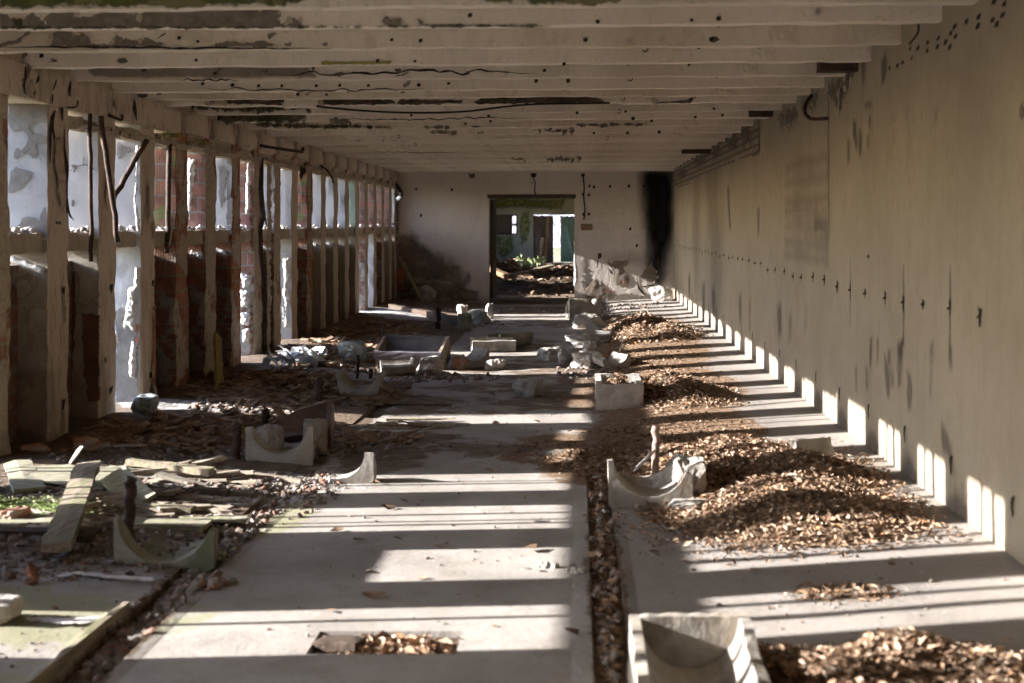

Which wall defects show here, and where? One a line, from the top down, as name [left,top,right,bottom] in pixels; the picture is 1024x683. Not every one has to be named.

peeling [382,17,403,26]
peeling [0,10,303,193]
spalling [317,68,604,126]
spalling [187,158,196,221]
flaking render [18,208,61,237]
spalling [573,240,659,301]
flaking render [71,253,100,402]
flaking render [115,267,141,402]